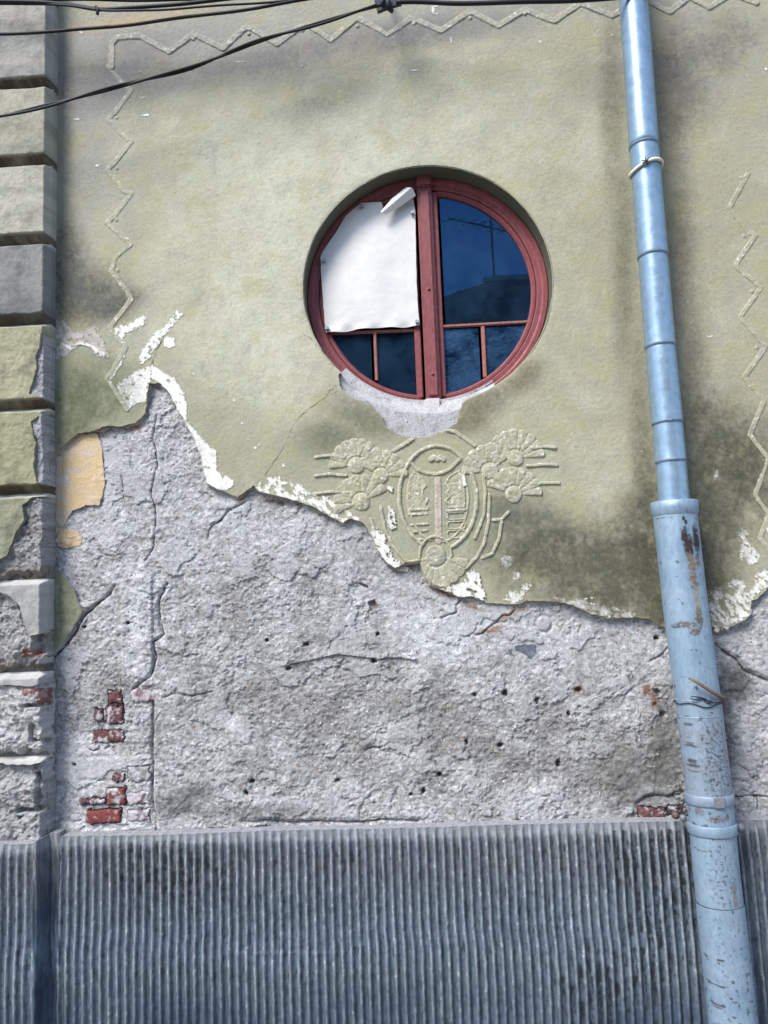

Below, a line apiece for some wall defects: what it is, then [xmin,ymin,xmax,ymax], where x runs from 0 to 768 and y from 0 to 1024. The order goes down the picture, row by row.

crack [55,589,114,657]
crack [146,417,160,557]
crack [120,584,206,814]
spalling [0,310,688,842]
leakage [504,489,664,625]
spalling [707,526,768,816]